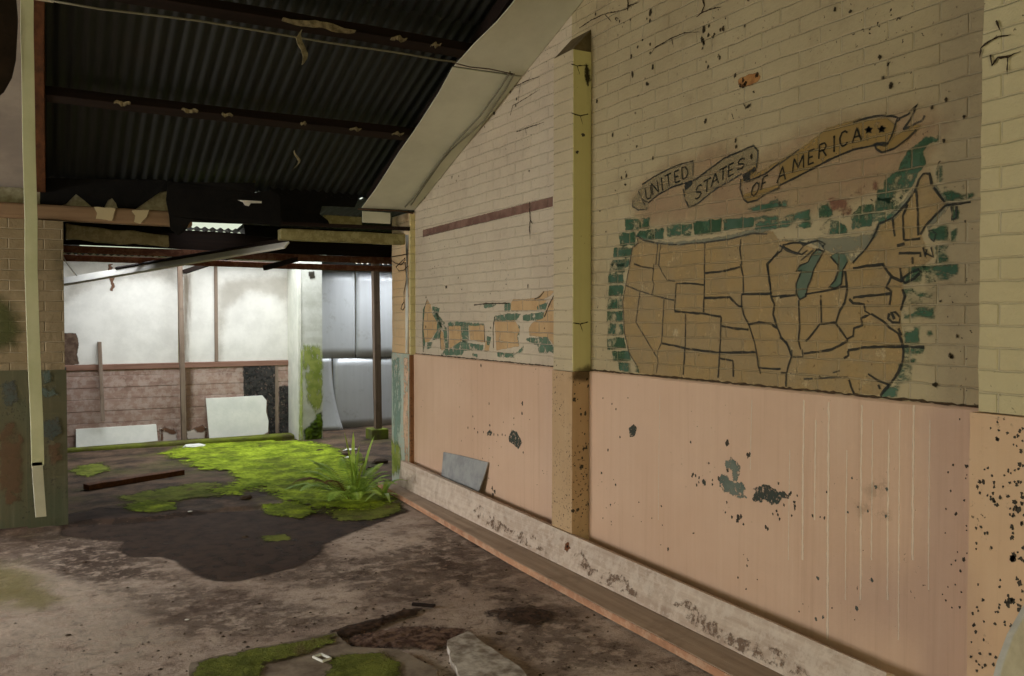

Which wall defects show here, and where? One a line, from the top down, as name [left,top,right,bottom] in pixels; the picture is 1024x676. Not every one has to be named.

crack [579,0,638,28]
crack [650,0,720,55]
crack [979,20,1021,72]
peeling [94,207,116,221]
peeling [132,210,149,224]
peeling [472,401,530,453]
peeling [691,439,798,531]
damp [788,400,830,640]
damp [845,405,915,640]